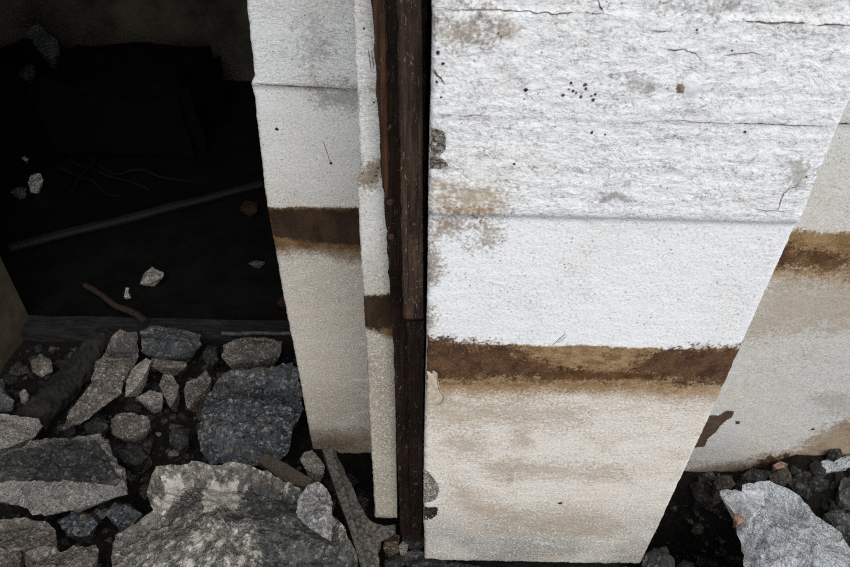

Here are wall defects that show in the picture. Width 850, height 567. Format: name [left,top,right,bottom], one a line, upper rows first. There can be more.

water stain [267,206,361,260]
water stain [773,228,850,282]
water stain [364,294,392,338]
water stain [426,334,739,397]
peeling [694,411,740,449]